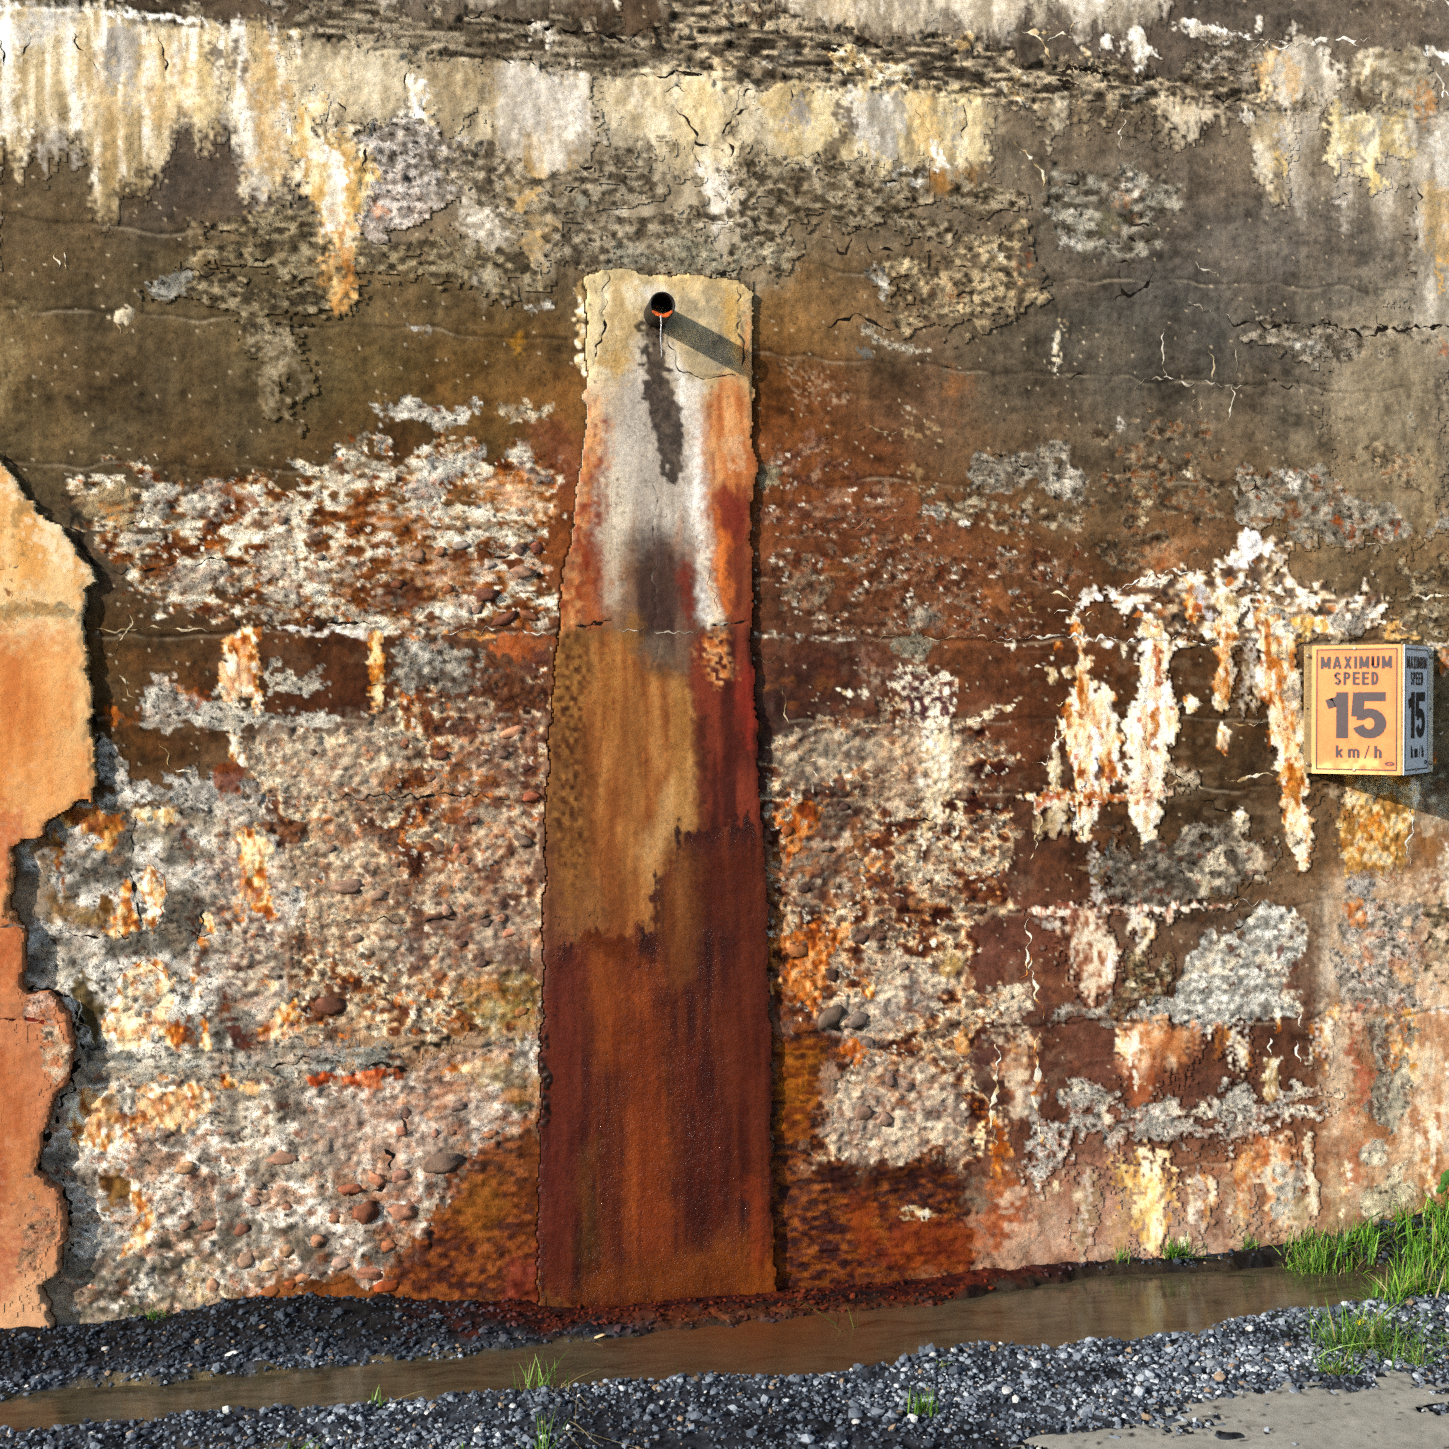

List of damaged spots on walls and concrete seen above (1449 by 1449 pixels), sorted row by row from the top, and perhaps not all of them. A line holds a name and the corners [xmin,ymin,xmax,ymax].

corrosion [0,463,270,1317]
spalling [105,199,331,362]
corrosion [157,883,307,1053]
spalling [0,392,569,1325]
corrosion [438,284,831,936]
water stain [0,0,1449,569]
spalling [350,111,1449,1225]
corrosion [767,905,1056,1290]
water stain [754,527,1449,1269]
crack [1189,303,1449,337]